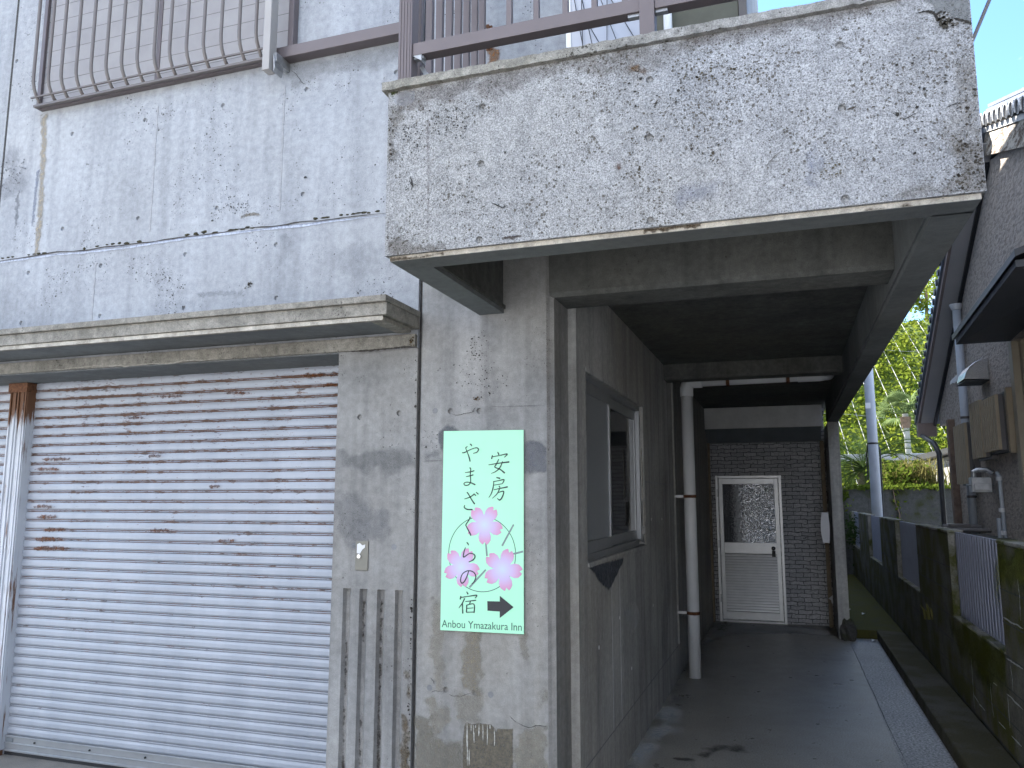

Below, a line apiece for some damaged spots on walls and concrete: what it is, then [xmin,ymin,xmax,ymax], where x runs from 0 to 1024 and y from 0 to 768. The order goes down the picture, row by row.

crack [918,10,971,28]
crack [0,210,386,263]
corrosion [34,505,69,551]